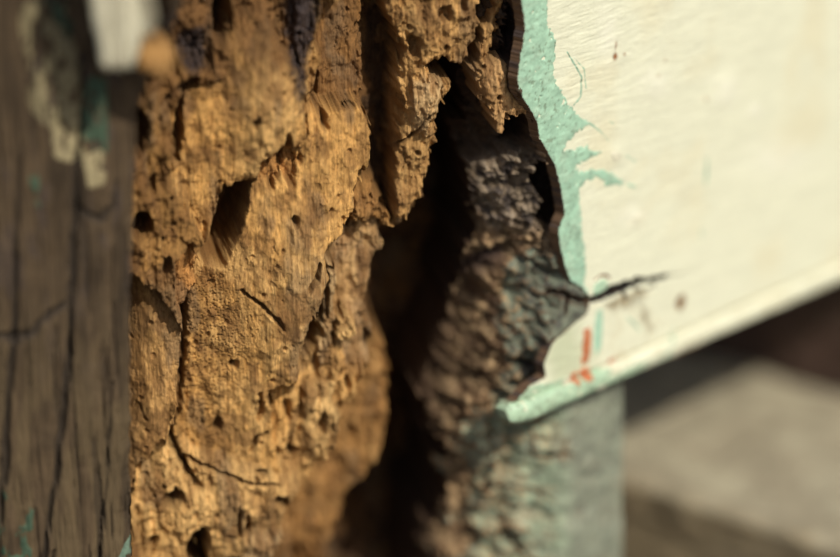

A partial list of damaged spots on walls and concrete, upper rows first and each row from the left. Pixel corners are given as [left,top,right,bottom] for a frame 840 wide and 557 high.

crack [0,50,118,557]
peeling [20,0,108,188]
peeling [119,0,676,557]
crack [544,274,680,316]